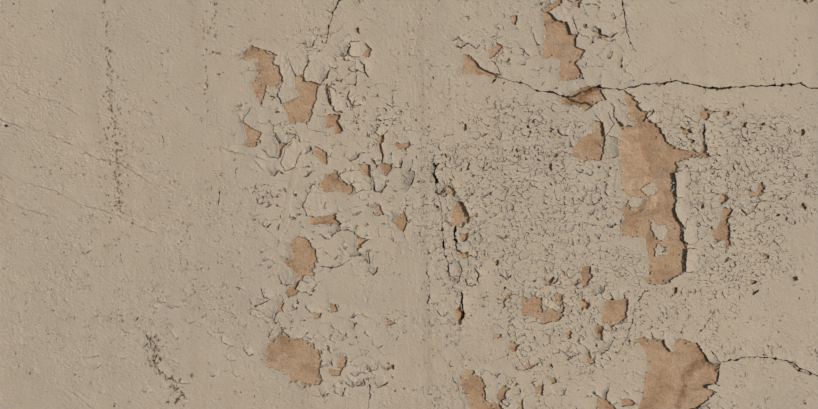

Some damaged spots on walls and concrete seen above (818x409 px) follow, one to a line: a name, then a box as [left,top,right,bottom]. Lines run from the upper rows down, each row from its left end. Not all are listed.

crack [492,74,818,106]
peeling [35,0,656,409]
crack [432,154,461,257]
peeling [601,89,816,310]
crack [615,289,650,354]
peeling [635,328,748,409]
crack [723,354,818,377]